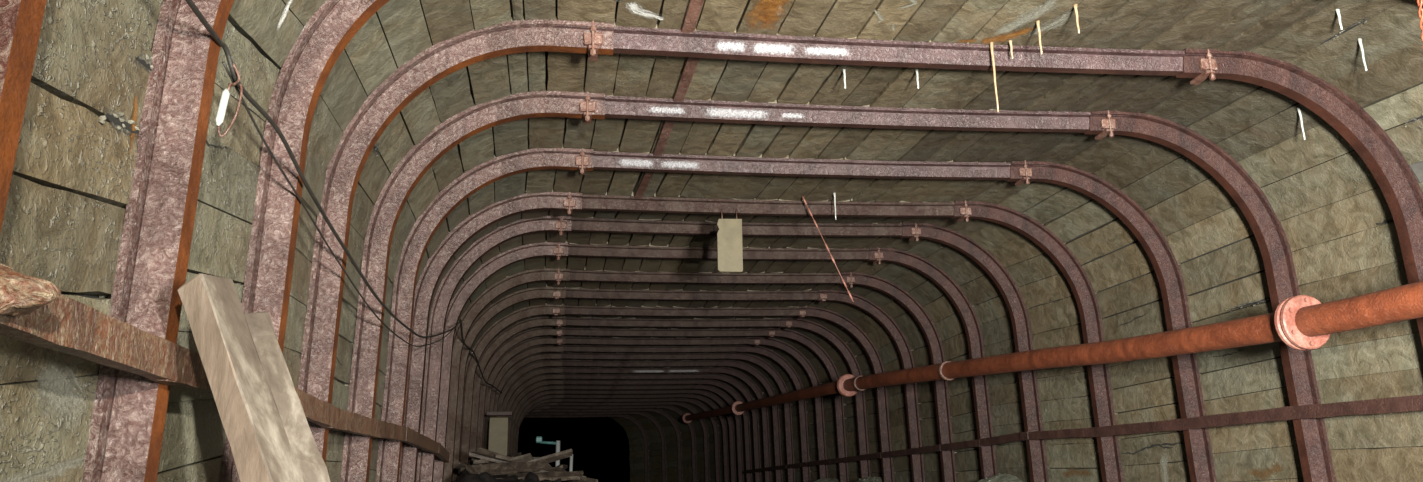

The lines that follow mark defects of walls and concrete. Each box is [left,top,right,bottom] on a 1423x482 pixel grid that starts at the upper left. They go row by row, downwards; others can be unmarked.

corrosion [747,0,786,29]